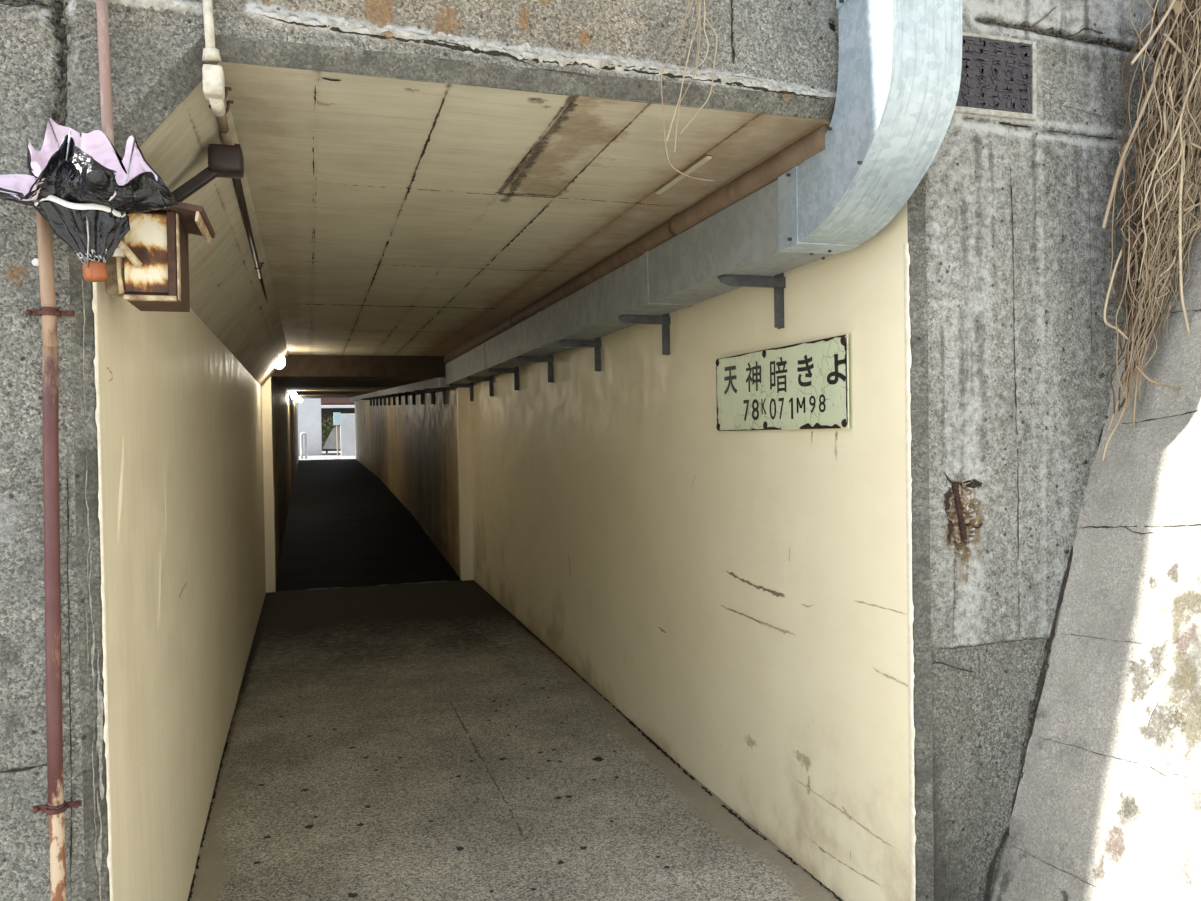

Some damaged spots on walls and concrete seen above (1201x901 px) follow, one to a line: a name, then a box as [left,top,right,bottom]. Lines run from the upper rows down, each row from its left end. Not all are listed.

corrosion [364,0,394,41]
crack [259,0,825,100]
damp [501,98,577,203]
crack [932,167,1201,901]
damp [1130,563,1201,743]
damp [1093,793,1136,877]